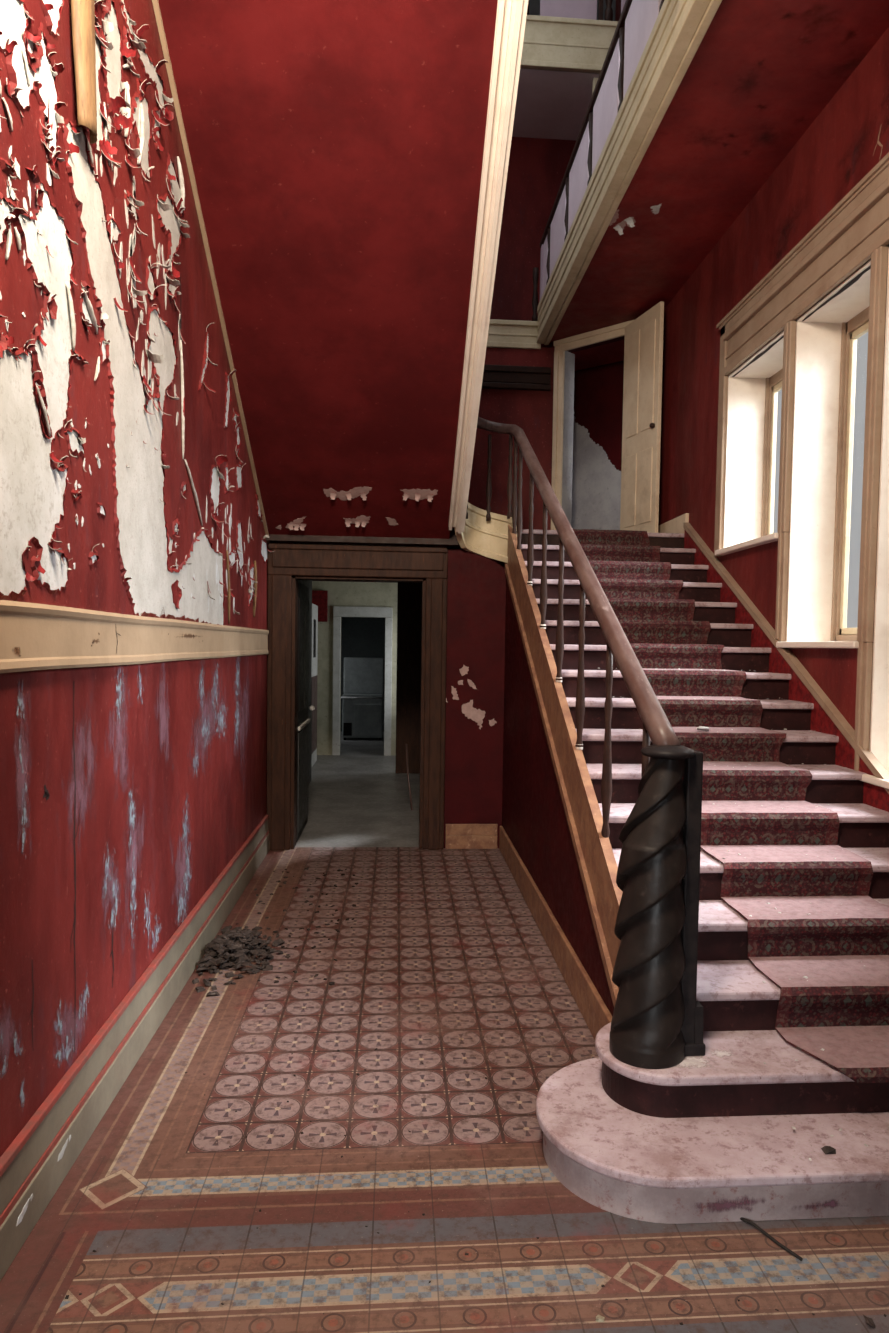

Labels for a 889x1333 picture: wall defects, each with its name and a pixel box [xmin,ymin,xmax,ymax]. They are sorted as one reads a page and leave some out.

peeling [0,0,306,625]
peeling [323,486,372,527]
peeling [401,489,438,502]
leakage [14,684,31,853]
leakage [70,721,94,837]
leakage [102,662,193,951]
leakage [193,661,249,775]
peeling [446,665,497,729]
leakage [0,1007,23,1077]
leakage [54,984,88,1064]